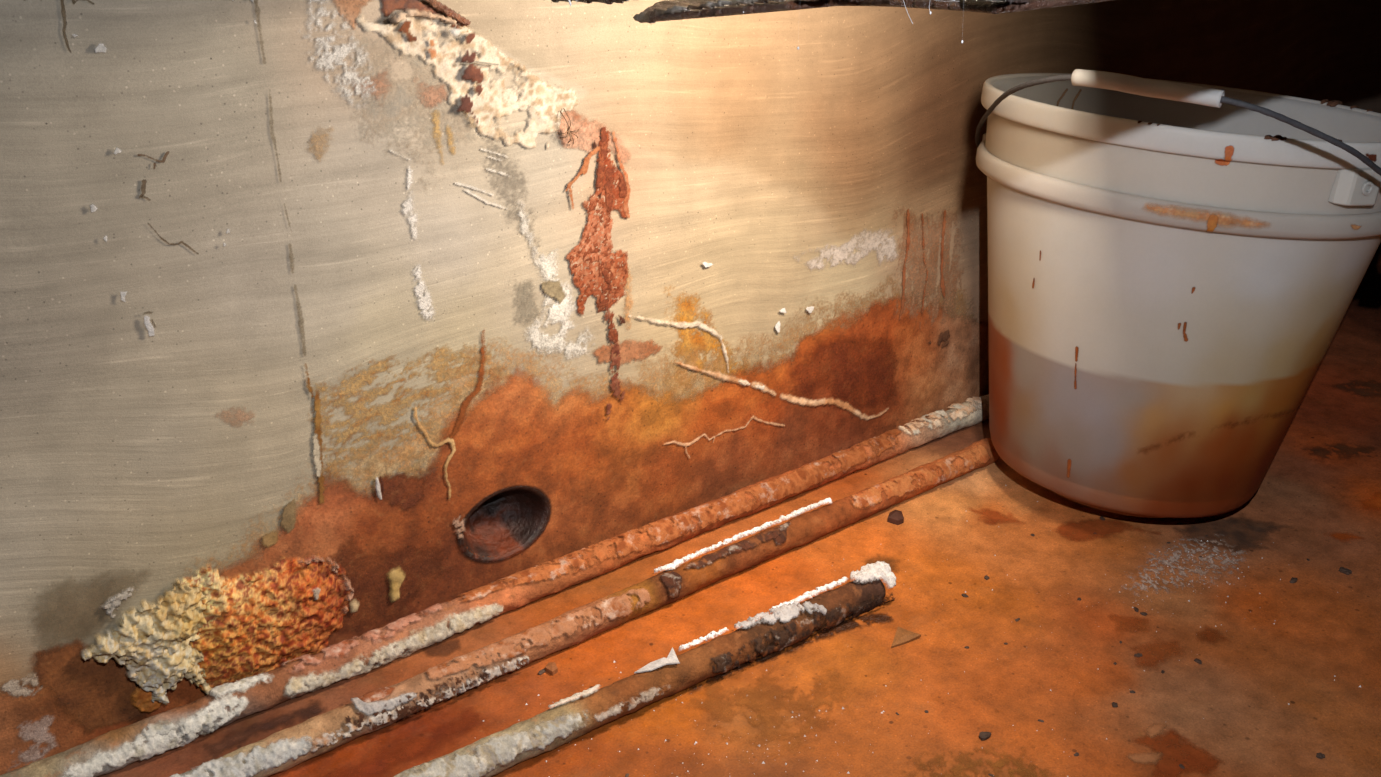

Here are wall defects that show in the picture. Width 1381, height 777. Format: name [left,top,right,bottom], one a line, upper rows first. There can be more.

crack [254,0,265,63]
flaking render [357,9,579,149]
crack [269,96,281,175]
crack [286,213,325,504]
rust [190,111,989,652]
crack [629,315,889,458]
flaking render [376,476,384,500]
spalling [458,485,551,563]
rust [692,613,893,690]
rust [0,663,207,775]
rust [210,702,324,756]
spalling [345,668,487,729]